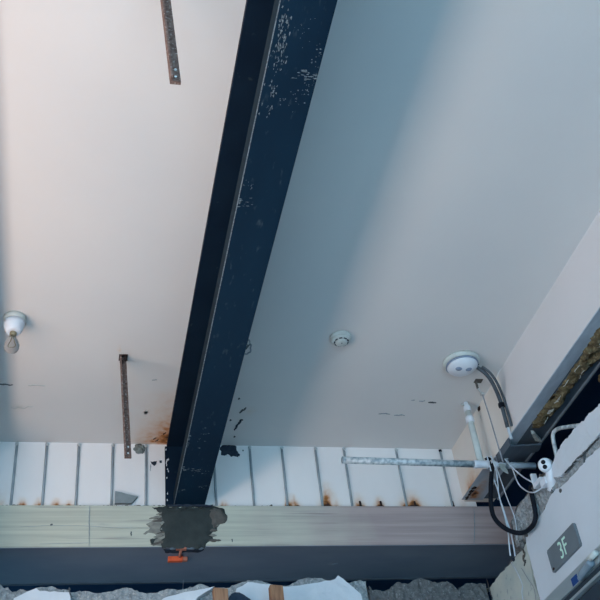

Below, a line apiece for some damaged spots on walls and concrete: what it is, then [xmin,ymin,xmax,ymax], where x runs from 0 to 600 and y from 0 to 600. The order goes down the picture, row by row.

rust [113,384,177,445]
peeling [220,407,246,459]
rust [0,477,83,505]
rust [279,436,503,506]
spalling [512,439,600,548]